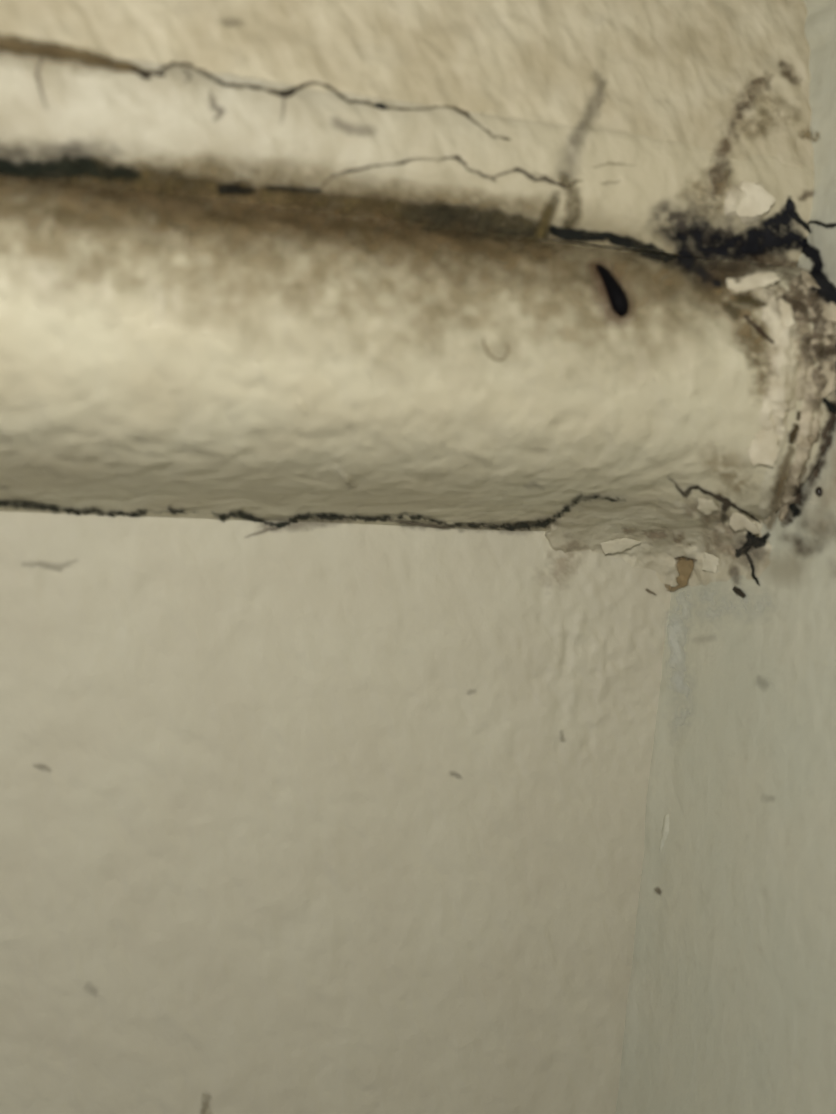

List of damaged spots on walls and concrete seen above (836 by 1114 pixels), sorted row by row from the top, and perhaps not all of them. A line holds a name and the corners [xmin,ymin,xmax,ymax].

crack [130,62,511,140]
leakage [732,78,765,133]
crack [325,159,412,183]
crack [442,155,565,188]
leakage [695,139,730,209]
leakage [0,156,810,363]
crack [787,193,836,305]
crack [669,398,836,524]
crack [0,494,625,531]
spalling [646,552,719,595]
spalling [697,497,770,586]